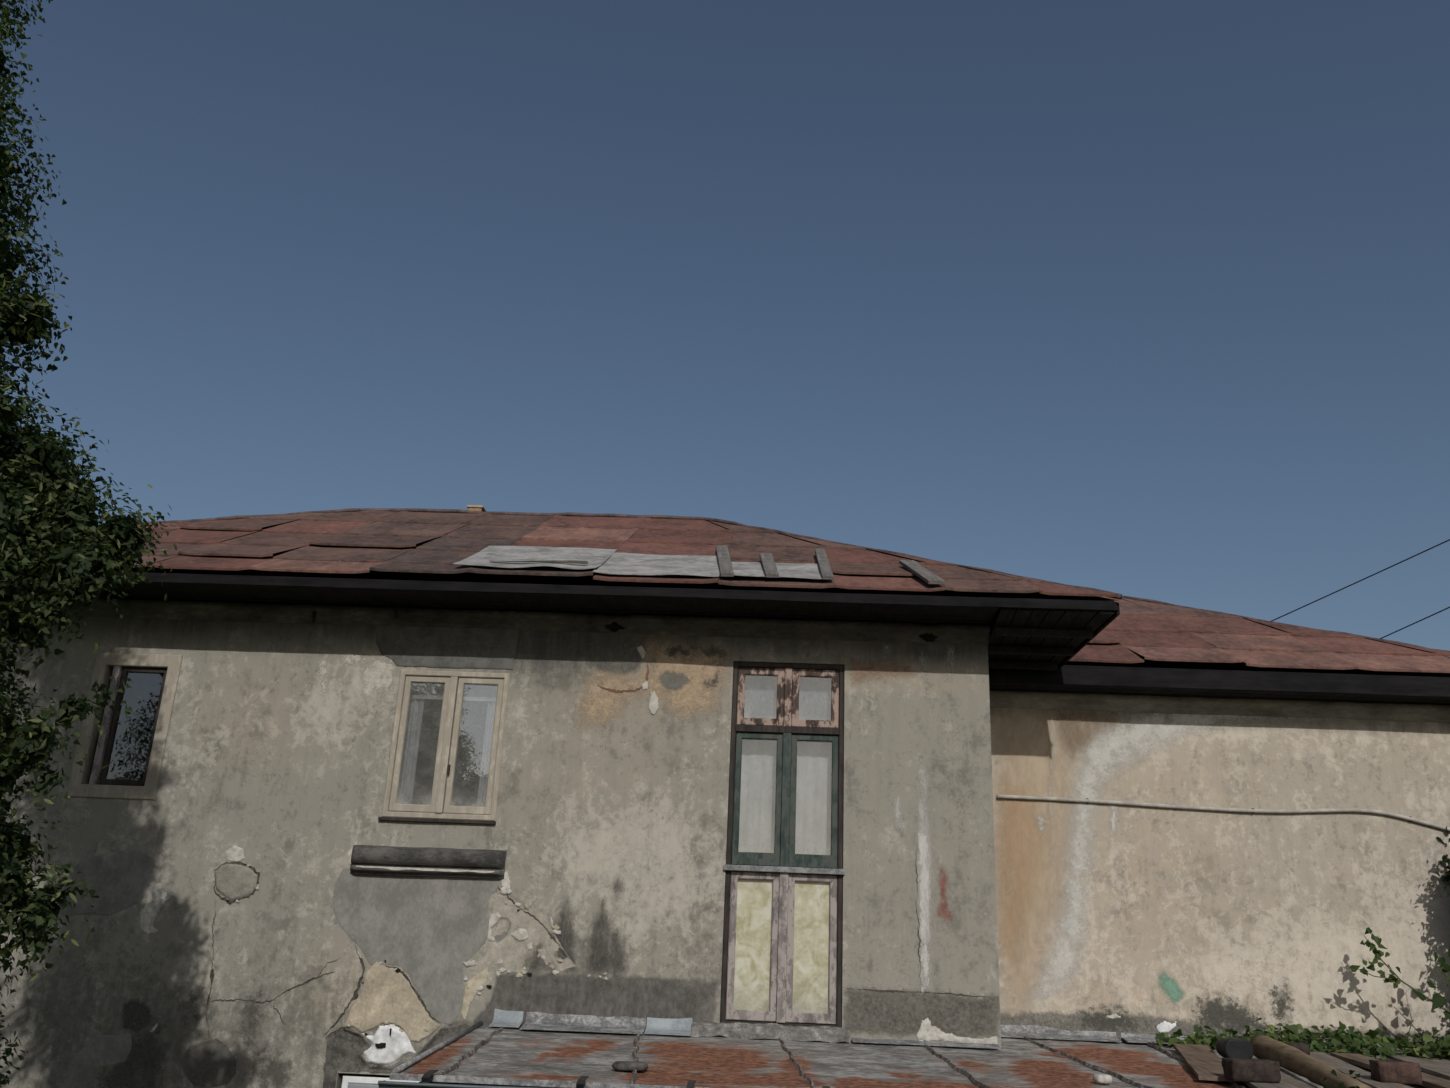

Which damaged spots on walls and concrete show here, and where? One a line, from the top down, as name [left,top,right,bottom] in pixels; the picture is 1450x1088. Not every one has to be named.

flaking render [580,640,728,724]
crack [206,903,365,1039]
flaking render [322,843,577,1088]